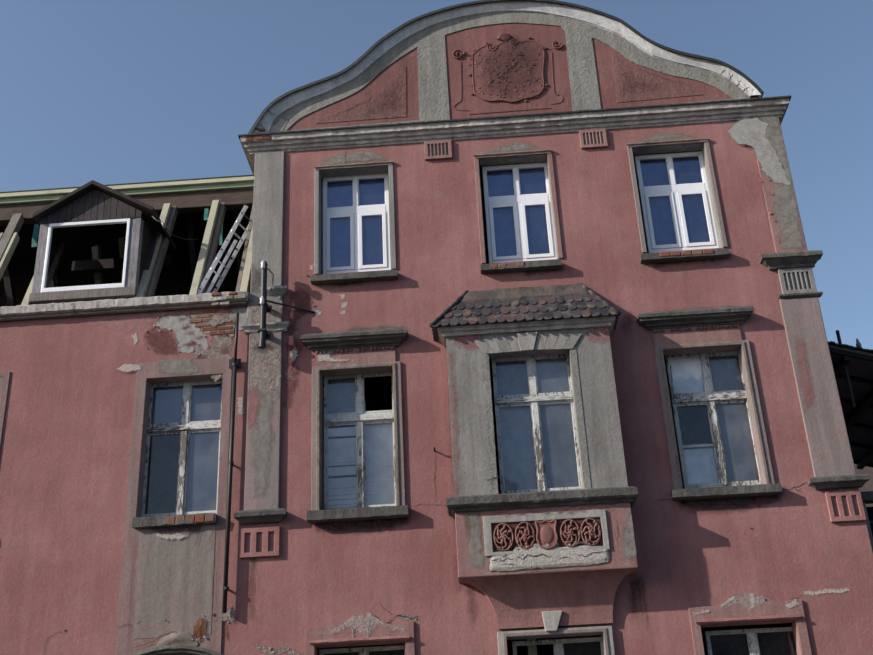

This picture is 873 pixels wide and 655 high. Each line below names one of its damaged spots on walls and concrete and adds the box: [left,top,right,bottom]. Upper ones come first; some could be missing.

peeling [727,115,804,251]
peeling [118,364,141,372]
peeling [132,291,316,425]
crack [352,602,418,637]